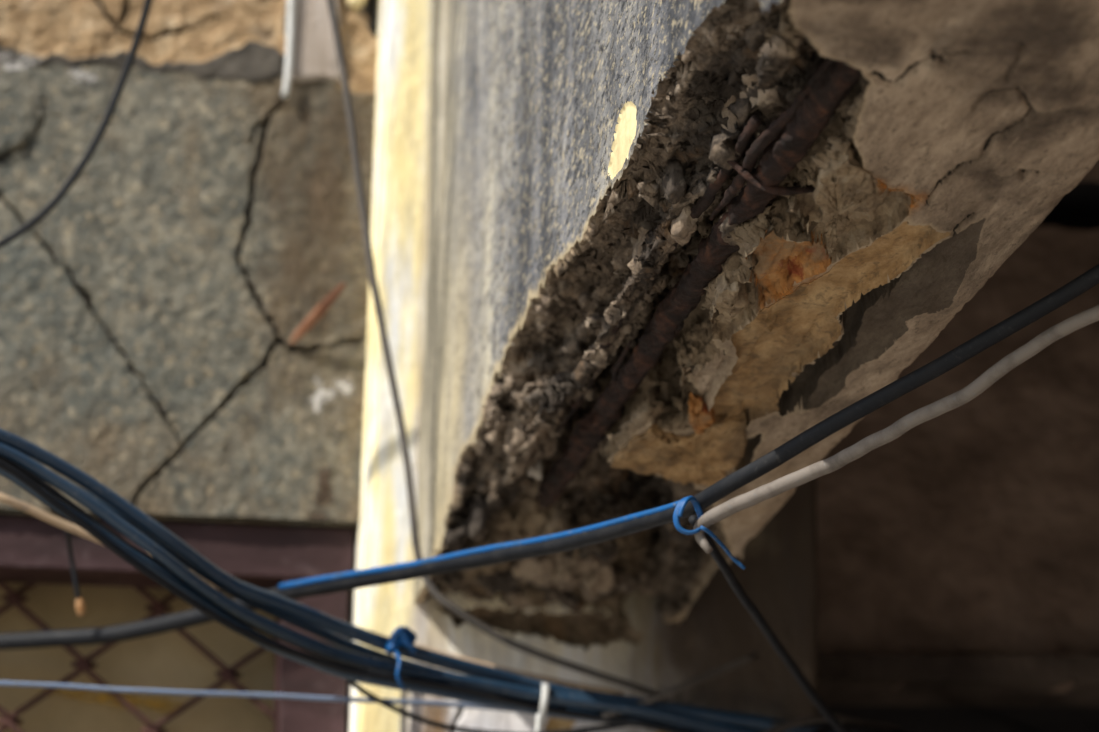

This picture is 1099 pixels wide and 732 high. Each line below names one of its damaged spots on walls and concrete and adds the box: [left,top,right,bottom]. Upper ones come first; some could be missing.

crack [95,0,218,41]
crack [872,51,946,82]
crack [926,86,1032,206]
crack [0,98,322,506]
spalling [434,0,986,556]
spalling [422,504,735,651]
peeling [544,717,575,731]